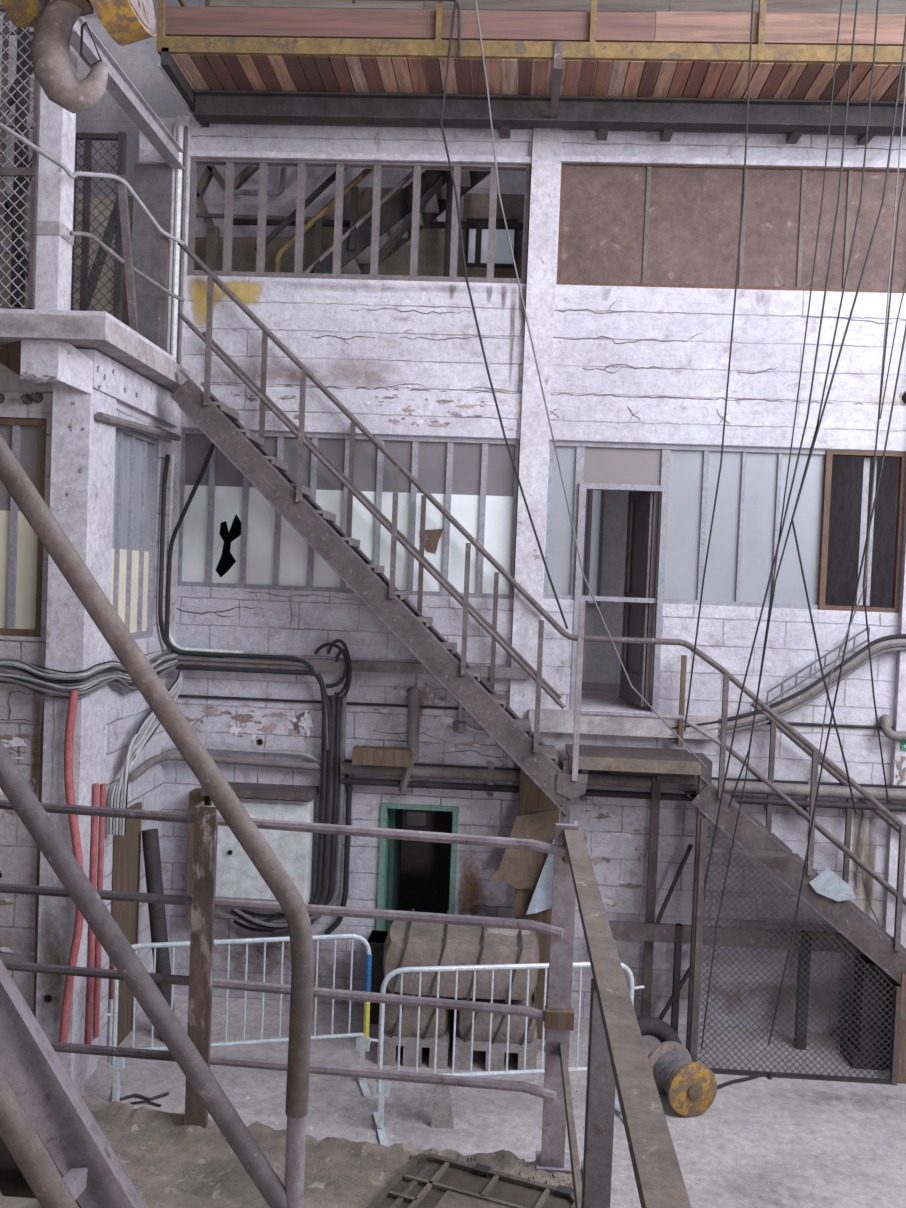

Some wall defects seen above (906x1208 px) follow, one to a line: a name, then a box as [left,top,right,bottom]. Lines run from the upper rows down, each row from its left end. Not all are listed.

crack [313,308,513,344]
leakage [489,291,525,329]
crack [550,300,906,424]
crack [202,382,522,394]
spalling [186,705,307,746]